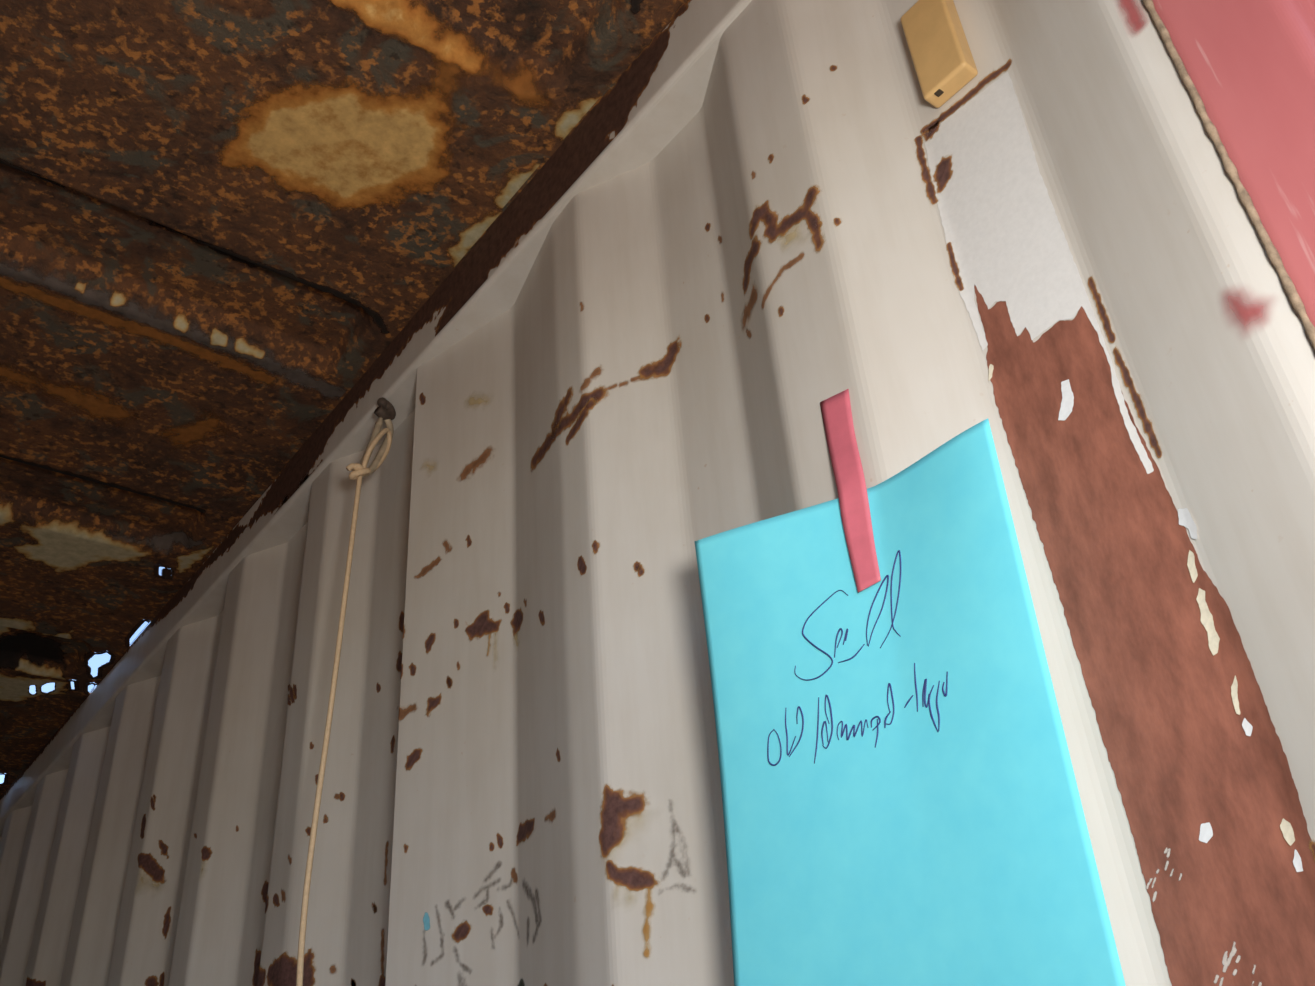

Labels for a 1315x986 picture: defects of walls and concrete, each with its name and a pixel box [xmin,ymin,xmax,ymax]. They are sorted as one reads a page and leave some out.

rust [743,186,841,338]
rust [0,0,691,800]
rust [138,795,169,883]
rust [194,833,212,861]
rust [384,841,408,885]
rust [489,810,556,851]
rust [599,785,658,957]
rust [261,881,285,913]
rust [162,906,171,939]
rust [452,921,471,943]
rust [145,972,164,986]
rust [252,949,336,986]